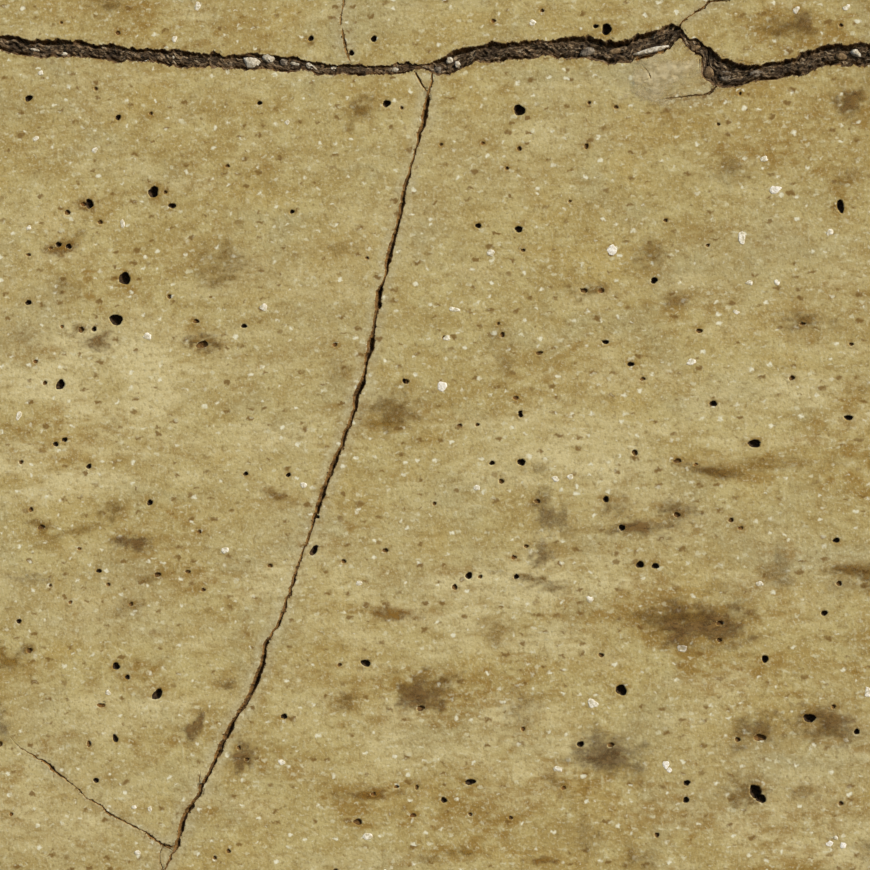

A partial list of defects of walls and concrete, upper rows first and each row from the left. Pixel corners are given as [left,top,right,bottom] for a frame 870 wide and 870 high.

crack [0,0,870,102]
crack [8,70,436,870]